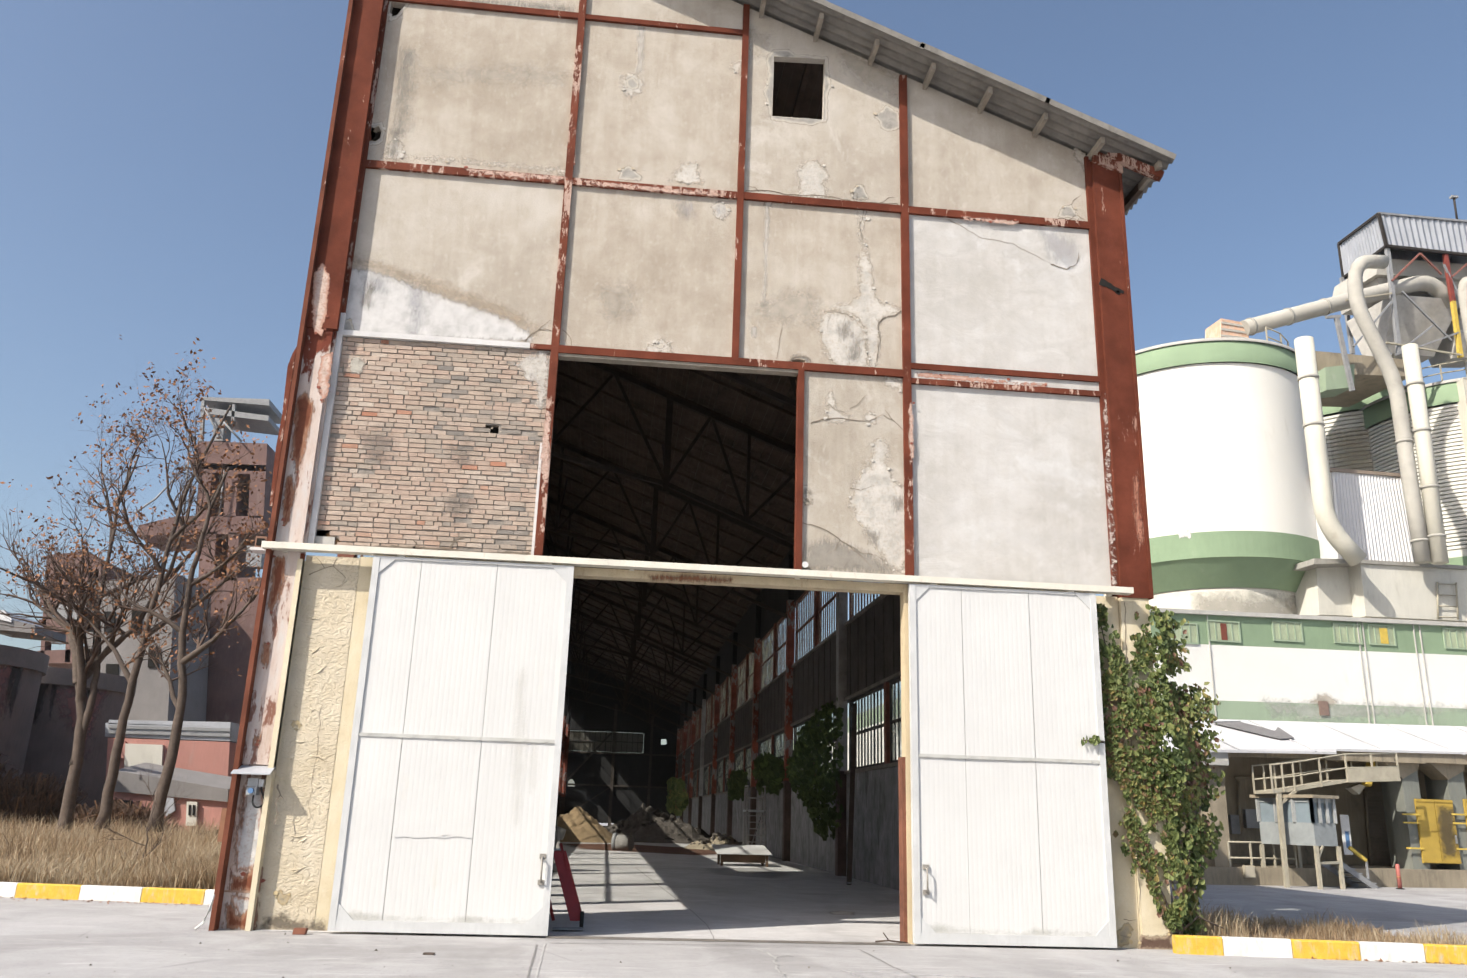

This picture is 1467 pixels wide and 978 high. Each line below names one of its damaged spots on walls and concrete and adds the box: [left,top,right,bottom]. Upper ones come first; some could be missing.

crack [939,197,1083,270]
peeling [311,263,354,336]
flaking render [802,185,1047,463]
peeling [317,352,333,403]
rust [281,392,315,526]
flaking render [824,391,905,573]
rust [266,555,288,616]
rust [261,642,271,669]
rust [225,867,266,930]